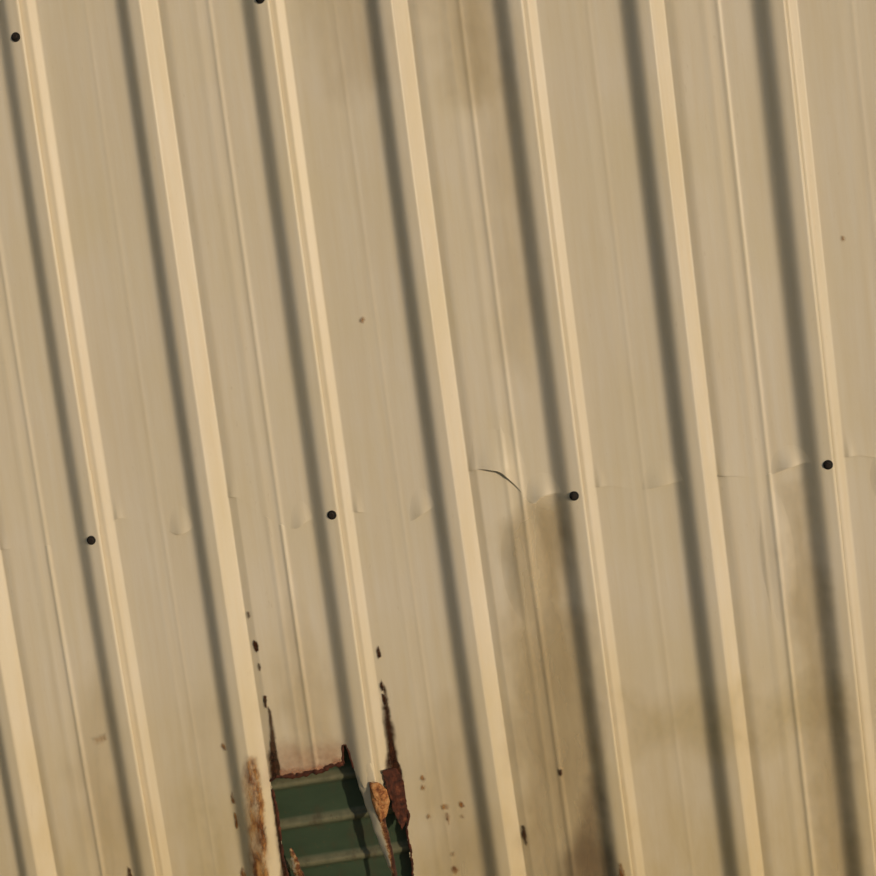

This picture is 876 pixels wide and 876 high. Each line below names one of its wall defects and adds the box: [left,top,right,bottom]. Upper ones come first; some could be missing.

rust [241,696,354,876]
rust [369,681,414,876]